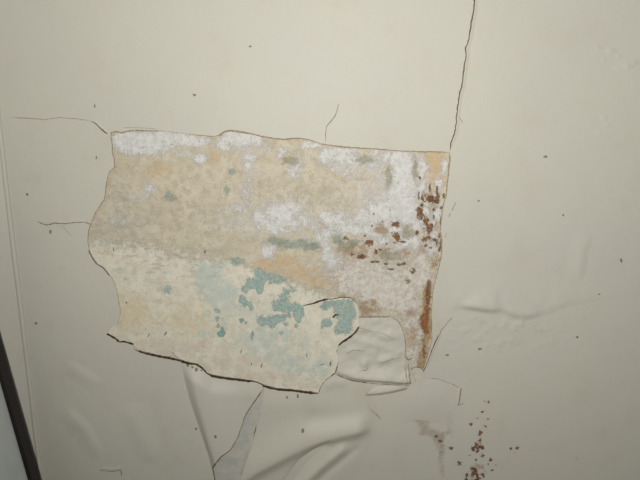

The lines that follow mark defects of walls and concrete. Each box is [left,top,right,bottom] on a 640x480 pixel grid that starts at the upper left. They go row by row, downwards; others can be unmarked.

crack [450,0,478,149]
crack [13,117,154,134]
peeling [88,130,451,394]
damp [111,130,449,369]
corrosion [343,221,415,284]
corrosion [415,184,445,251]
corrosion [417,281,432,368]
corrosion [464,411,494,480]